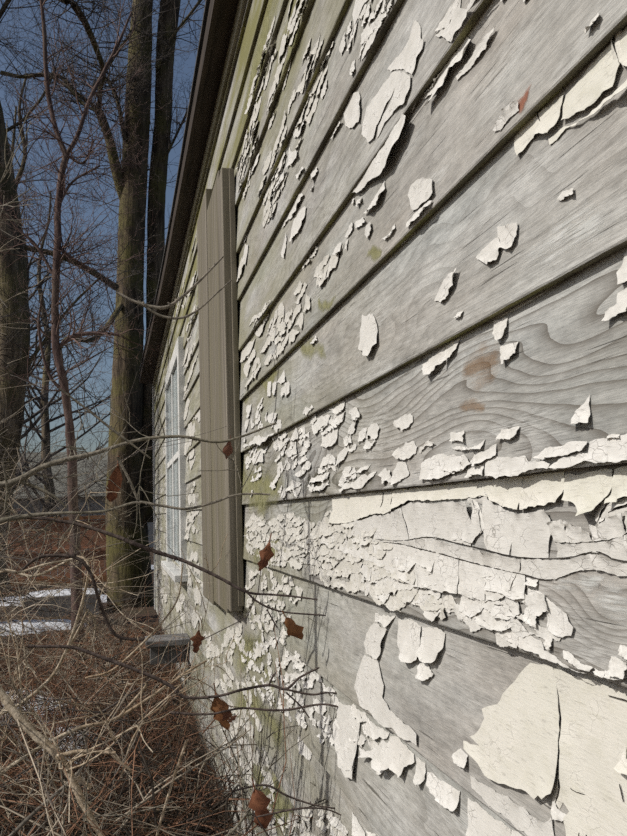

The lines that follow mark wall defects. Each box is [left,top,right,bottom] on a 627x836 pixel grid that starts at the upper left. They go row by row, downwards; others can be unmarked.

peeling [493,100,519,131]
peeling [514,27,627,156]
peeling [174,271,200,470]
peeling [236,0,496,389]
peeling [476,222,518,264]
peeling [492,317,519,364]
peeling [601,252,627,321]
crack [364,489,627,580]
peeling [156,371,627,836]
crack [553,665,585,808]